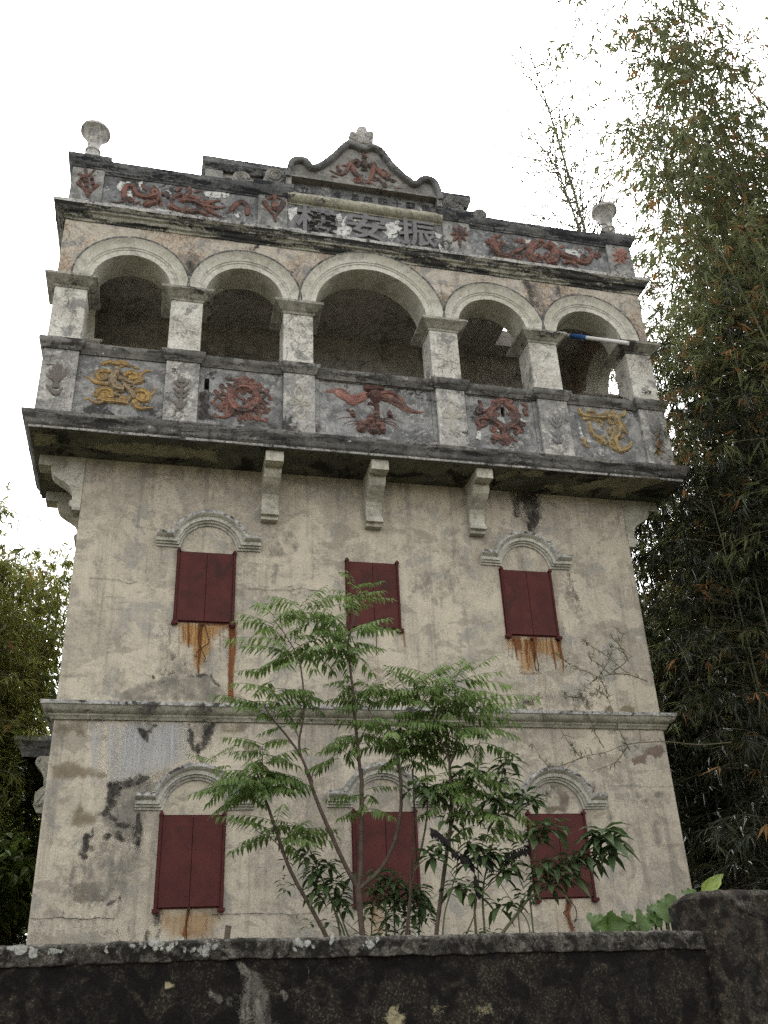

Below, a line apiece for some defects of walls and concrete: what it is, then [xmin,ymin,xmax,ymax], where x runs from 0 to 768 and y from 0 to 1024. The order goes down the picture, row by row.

leakage [510,492,542,532]
rust [181,622,236,700]
rust [512,636,564,671]
leakage [64,644,222,906]